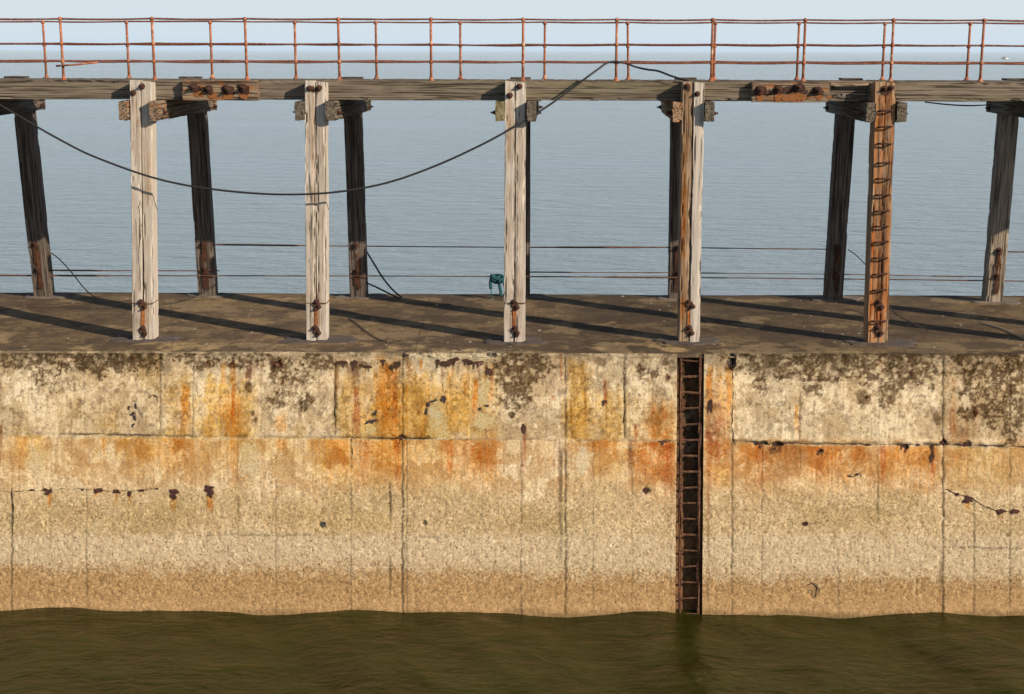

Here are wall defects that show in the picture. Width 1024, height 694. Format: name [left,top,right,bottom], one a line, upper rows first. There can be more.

water stain [0,353,337,412]
rust [336,360,401,373]
rust [436,357,492,375]
water stain [486,353,556,418]
water stain [722,353,944,407]
water stain [951,353,1024,443]
crack [4,487,179,571]
crack [204,485,214,498]
crack [945,489,1020,515]